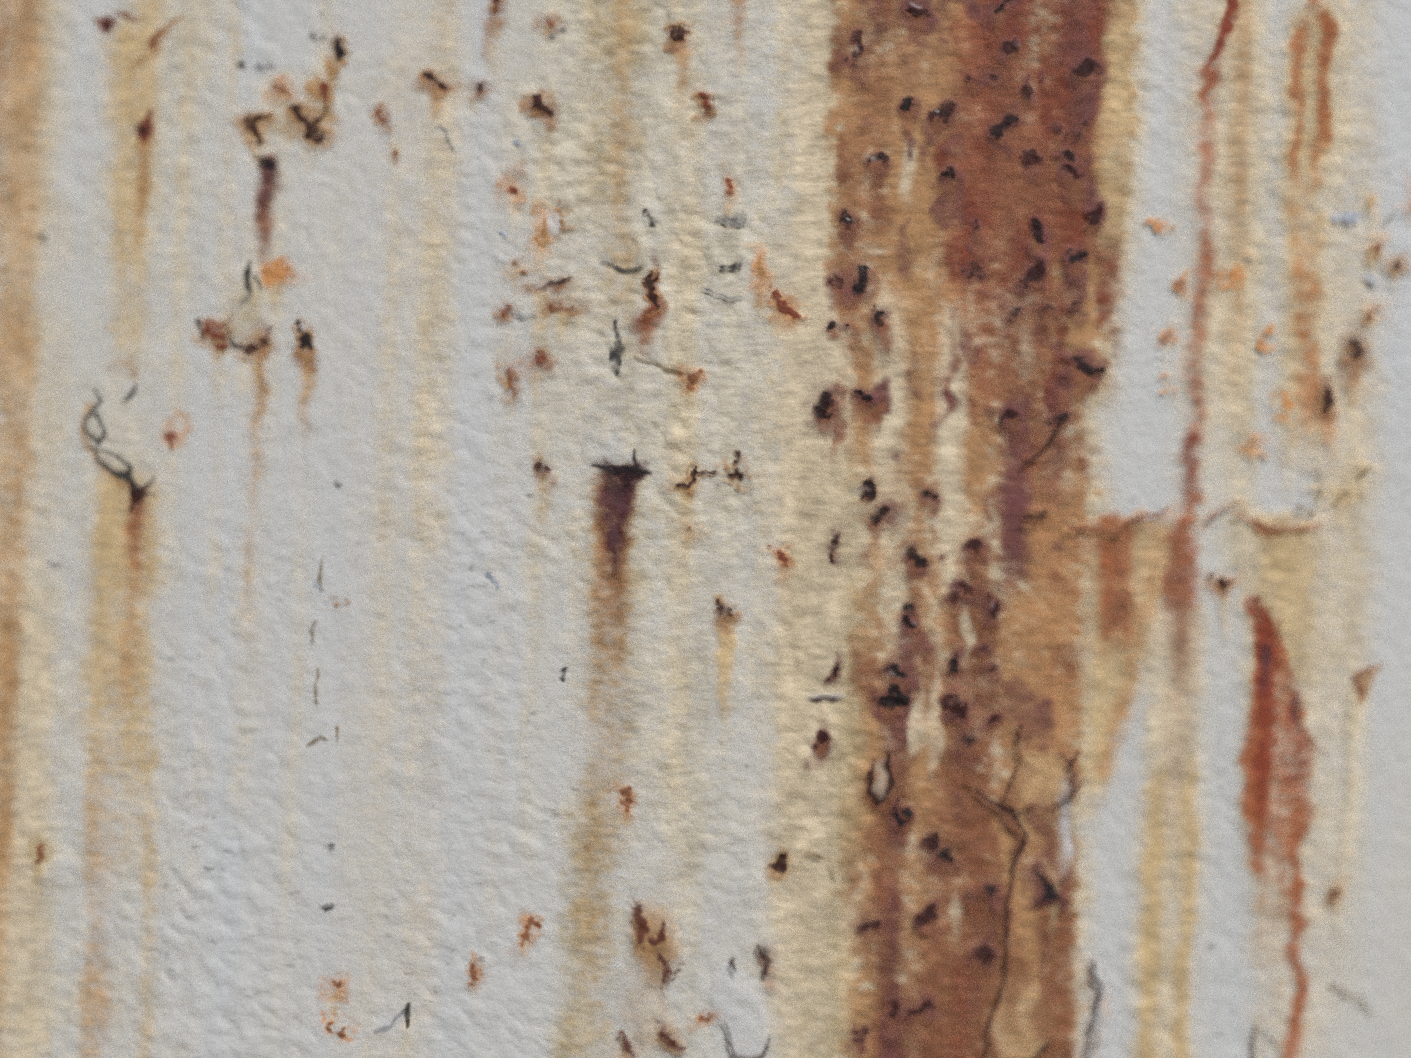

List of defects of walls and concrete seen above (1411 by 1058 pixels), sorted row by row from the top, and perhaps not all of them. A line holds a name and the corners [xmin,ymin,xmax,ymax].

corrosion [241,37,346,242]
corrosion [246,258,291,303]
corrosion [292,319,316,402]
corrosion [1341,337,1366,384]
corrosion [0,0,57,1058]
corrosion [592,453,650,616]
corrosion [755,0,1343,1058]
corrosion [1350,665,1379,736]
corrosion [574,801,610,874]
corrosion [570,896,605,979]
crack [975,724,1082,1058]
crack [1086,959,1104,1058]